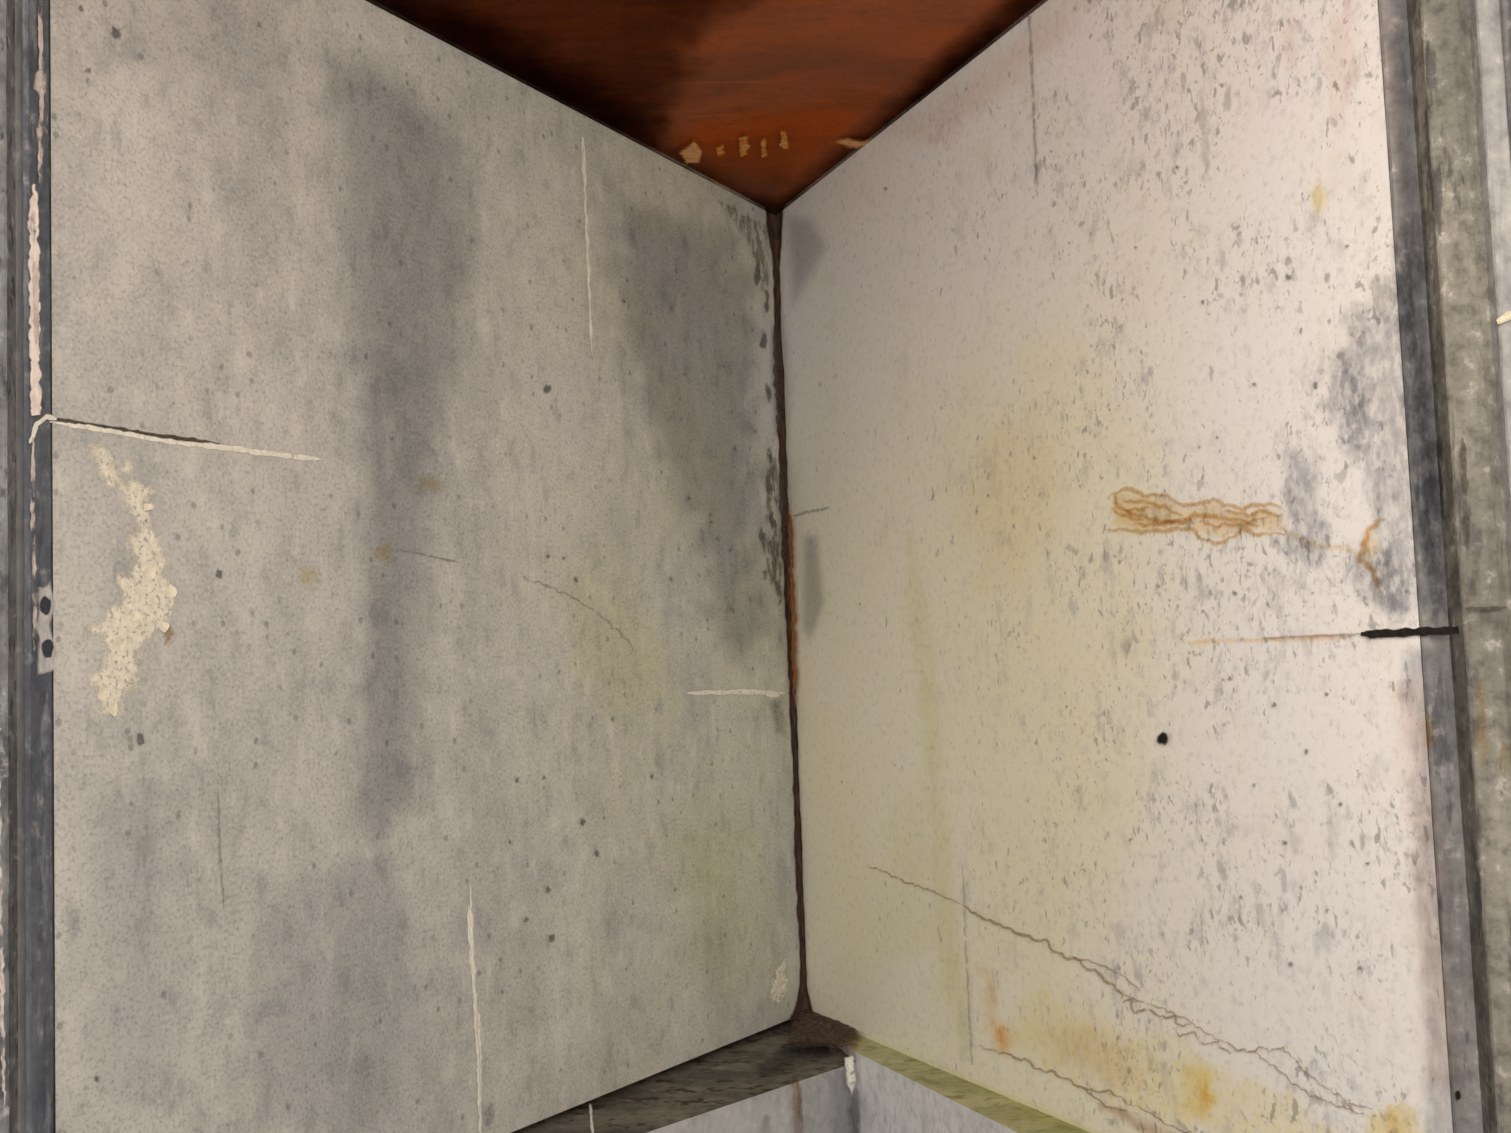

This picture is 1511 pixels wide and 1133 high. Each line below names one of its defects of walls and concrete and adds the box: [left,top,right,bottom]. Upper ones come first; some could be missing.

water stain [365,0,726,190]
peeling [680,131,789,163]
peeling [837,139,870,148]
water stain [581,137,593,353]
crack [50,418,221,444]
peeling [87,445,177,719]
rust [766,207,813,1018]
crack [874,868,1365,1115]
crack [983,1048,1191,1133]